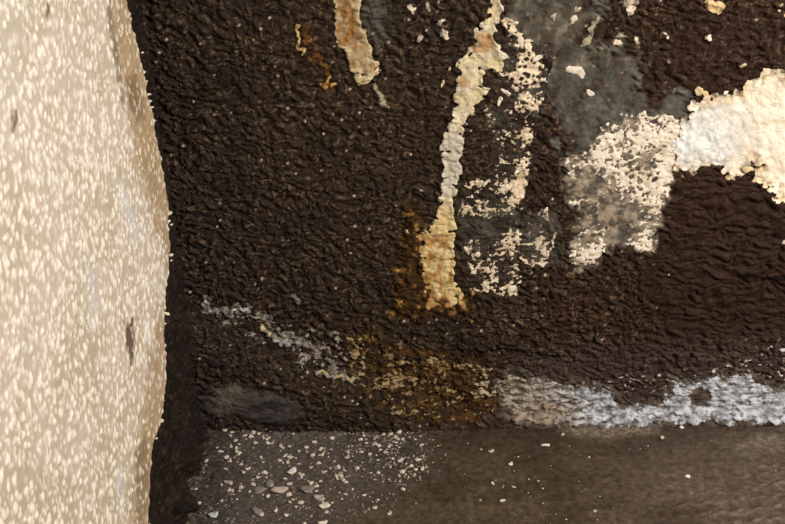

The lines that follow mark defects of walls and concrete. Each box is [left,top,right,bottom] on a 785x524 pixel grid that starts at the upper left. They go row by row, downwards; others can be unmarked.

corrosion [294,24,338,90]
spalling [622,0,639,15]
spalling [705,0,725,15]
water stain [390,0,693,323]
peeling [457,14,785,296]
corrosion [341,321,509,431]
water stain [493,346,785,454]